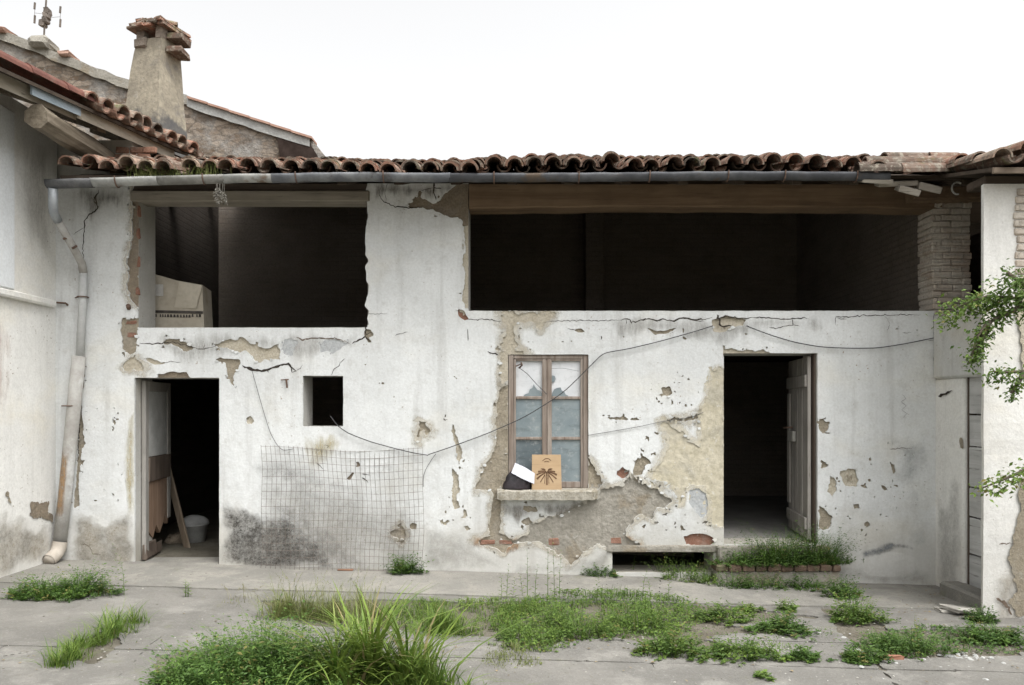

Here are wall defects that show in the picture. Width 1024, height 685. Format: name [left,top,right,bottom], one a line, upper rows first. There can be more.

crack [75,190,99,258]
flaking render [119,186,193,378]
flaking render [405,184,468,320]
crack [549,315,809,339]
crack [835,314,934,333]
flaking render [212,337,298,386]
crack [242,363,301,372]
flaking render [71,405,86,508]
flaking render [414,311,724,566]
flaking render [30,501,53,522]
water stain [226,510,327,566]
flaking render [1008,481,1024,617]